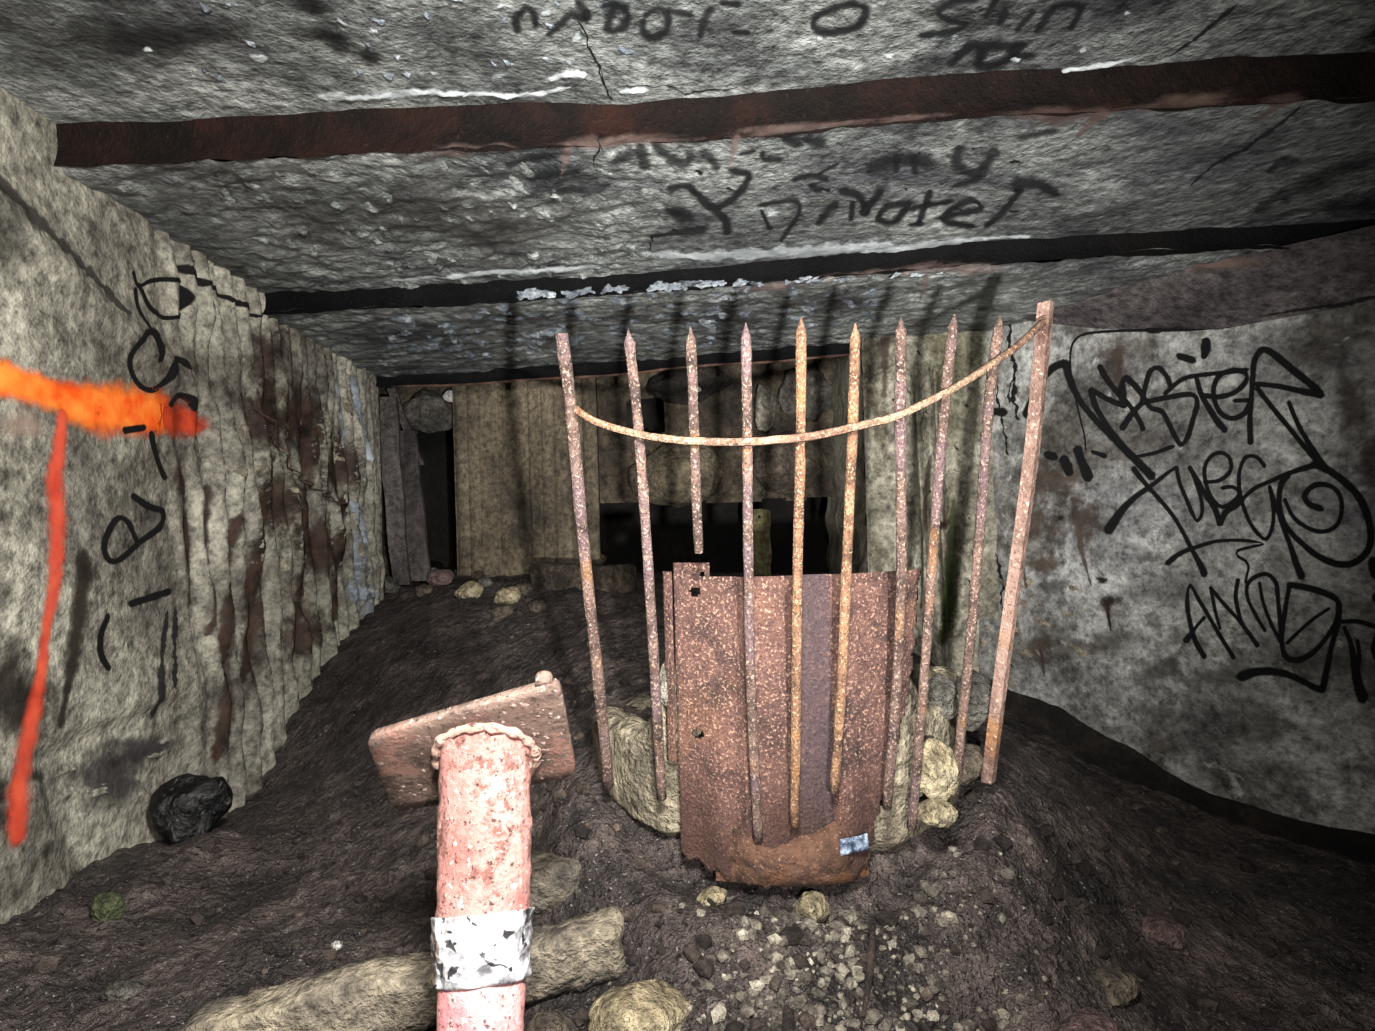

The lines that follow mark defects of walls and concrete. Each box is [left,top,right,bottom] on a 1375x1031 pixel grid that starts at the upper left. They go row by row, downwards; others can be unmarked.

crack [578,21,737,100]
crack [593,135,604,166]
leakage [335,369,375,462]
leakage [347,499,381,616]
crack [995,553,1005,611]
leakage [1011,460,1104,590]
leakage [1015,622,1048,676]